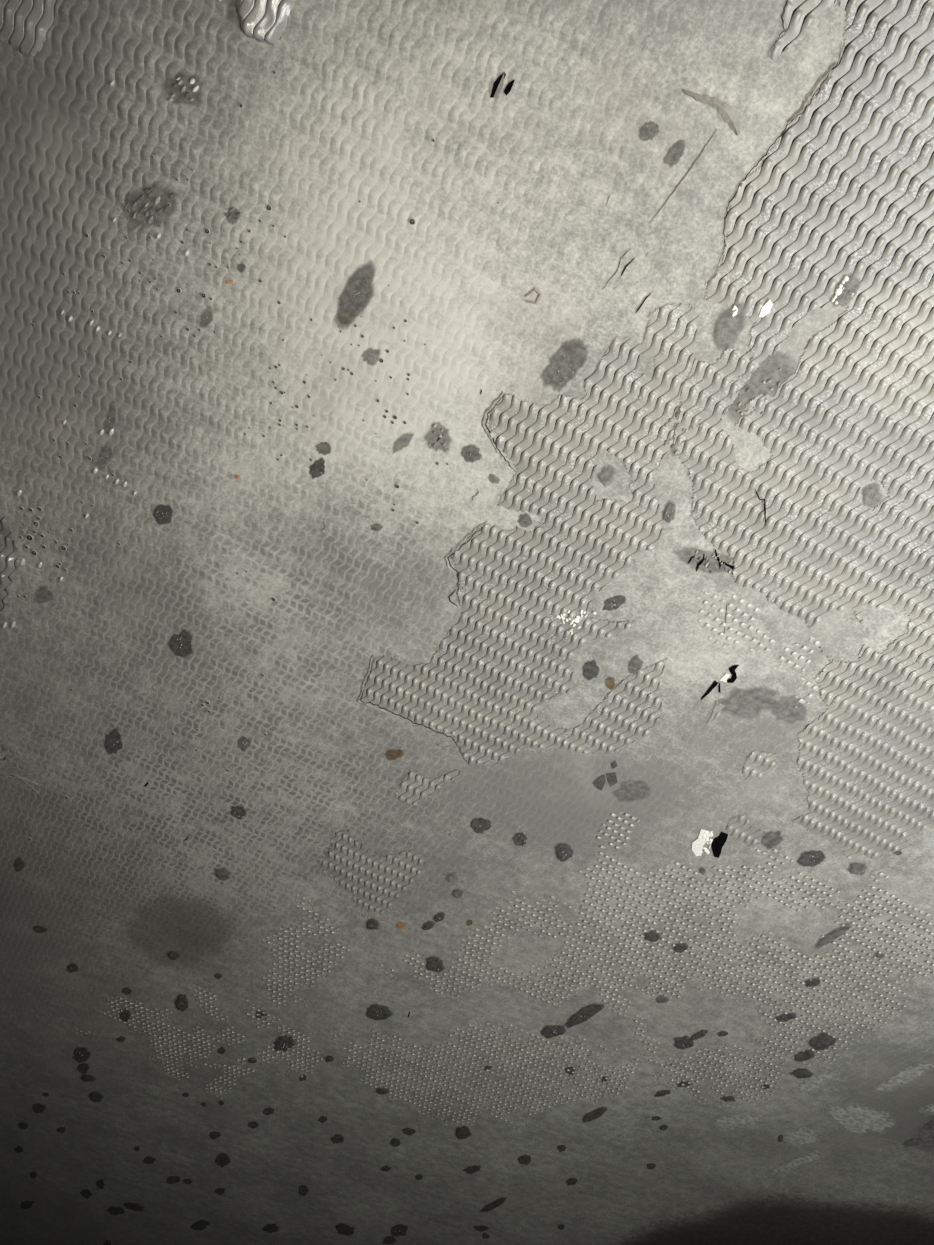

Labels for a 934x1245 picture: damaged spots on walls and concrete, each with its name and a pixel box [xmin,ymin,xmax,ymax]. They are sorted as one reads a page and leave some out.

spalling [165,74,201,104]
peeling [714,42,842,273]
spalling [225,207,241,223]
spalling [759,300,773,317]
spalling [725,355,794,420]
spalling [426,423,451,451]
peeling [481,391,515,471]
spalling [664,404,703,455]
spalling [676,549,736,573]
spalling [556,610,596,635]
flaking render [697,592,820,708]
flaking render [103,812,934,1132]